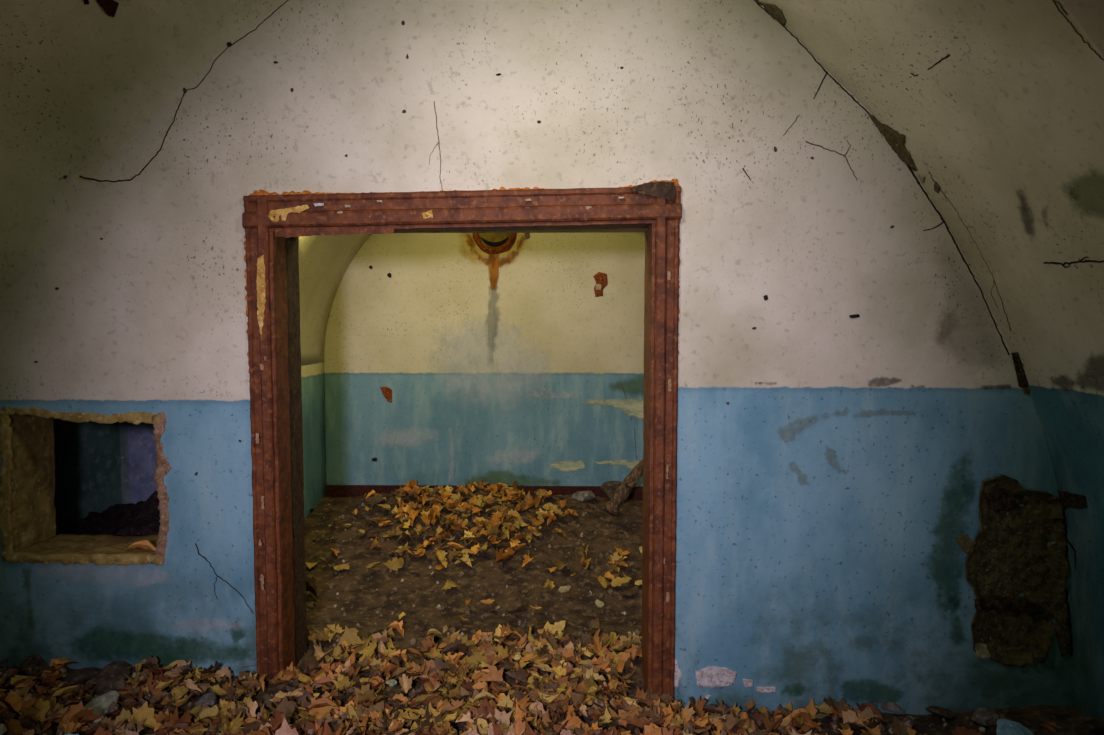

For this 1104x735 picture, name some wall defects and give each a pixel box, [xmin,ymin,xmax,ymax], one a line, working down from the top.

crack [79,0,288,182]
crack [429,101,443,190]
crack [755,1,870,180]
corrosion [467,234,526,346]
crack [906,164,1011,355]
crack [1043,257,1104,268]
crack [195,543,253,613]
spalling [957,474,1088,668]
peeling [674,659,682,687]
peeling [695,666,776,693]